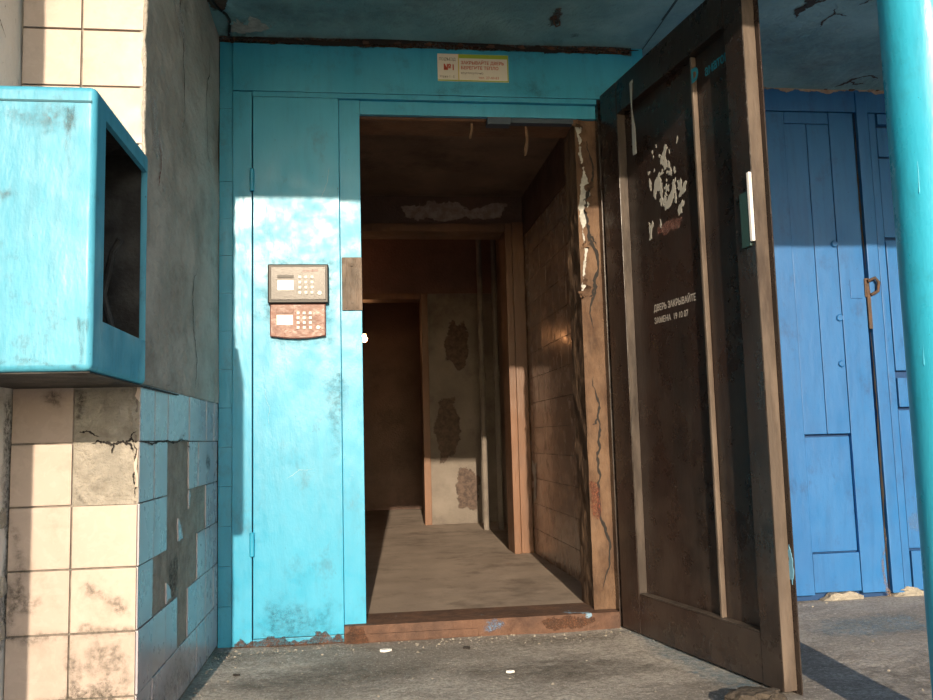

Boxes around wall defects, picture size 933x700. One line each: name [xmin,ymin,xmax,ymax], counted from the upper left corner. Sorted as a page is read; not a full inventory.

peeling [207,0,271,38]
spalling [794,0,826,18]
peeling [401,201,508,222]
peeling [572,119,595,298]
peeling [444,320,469,371]
peeling [73,387,140,506]
crack [80,430,190,494]
peeling [433,397,461,463]
peeling [455,467,481,510]
crack [592,376,612,587]
peeling [152,441,205,648]
corrosion [234,625,369,649]